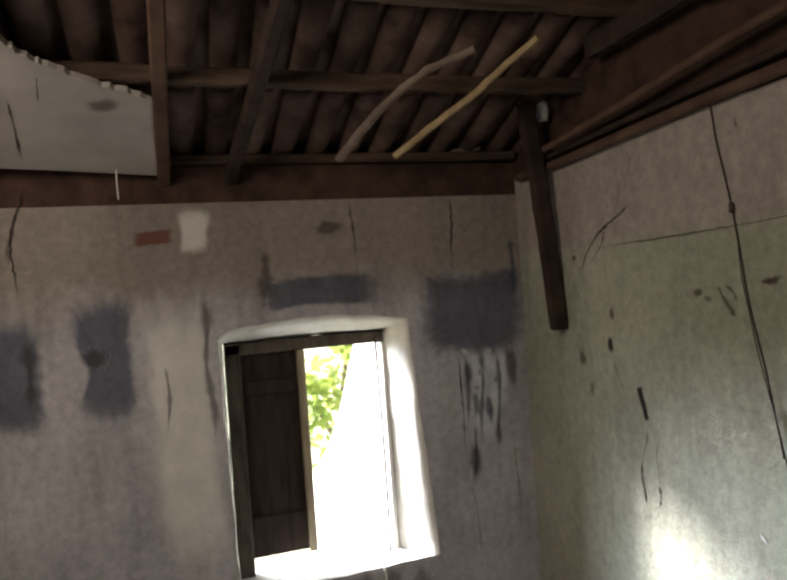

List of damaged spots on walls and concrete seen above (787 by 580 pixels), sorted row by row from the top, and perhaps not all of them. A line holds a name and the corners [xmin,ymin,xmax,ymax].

crack [9,195,21,285]
crack [572,155,629,267]
crack [630,215,787,243]
water stain [434,244,514,347]
water stain [0,334,39,425]
water stain [79,311,132,411]